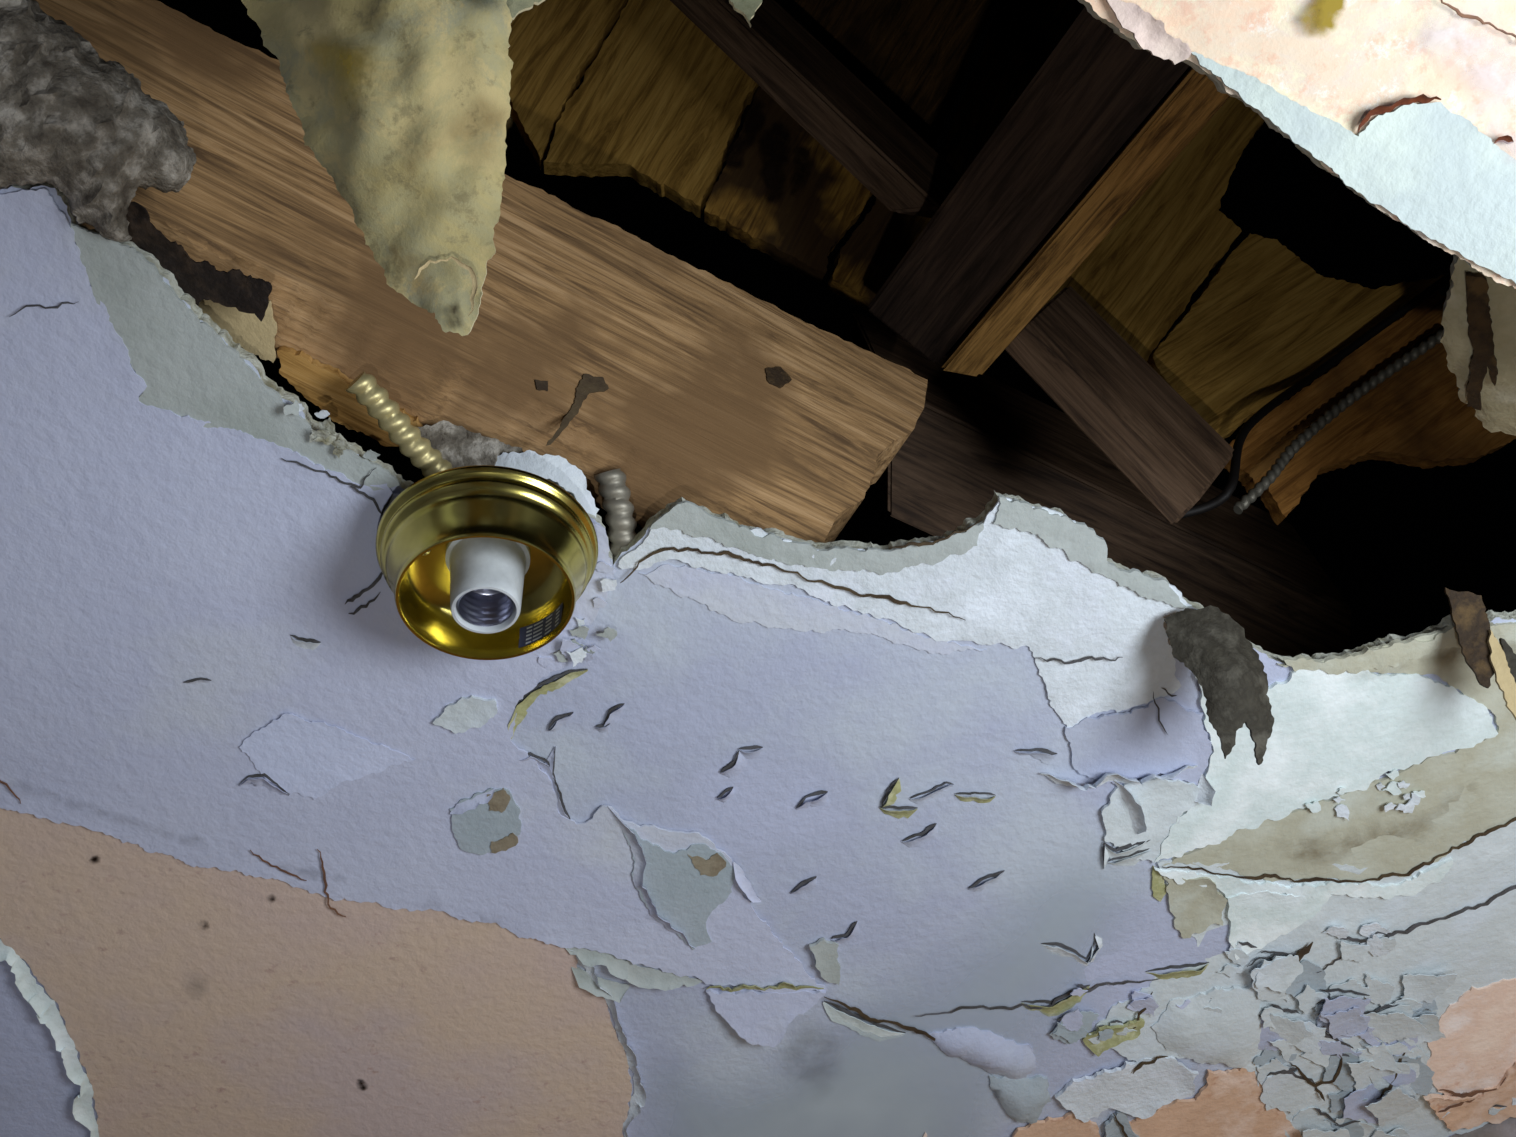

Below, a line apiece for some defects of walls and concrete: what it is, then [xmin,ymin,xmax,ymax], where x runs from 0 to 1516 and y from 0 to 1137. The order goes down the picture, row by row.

water stain [1302,0,1344,34]
crack [1441,0,1516,38]
peeling [1191,52,1516,284]
crack [620,547,966,621]
peeling [0,188,1193,1048]
peeling [1049,621,1516,1137]
crack [1162,817,1516,883]
crack [1386,885,1516,938]
crack [1296,942,1342,973]
crack [824,978,1168,1074]
crack [1291,1054,1343,1101]
crack [1376,1053,1405,1100]